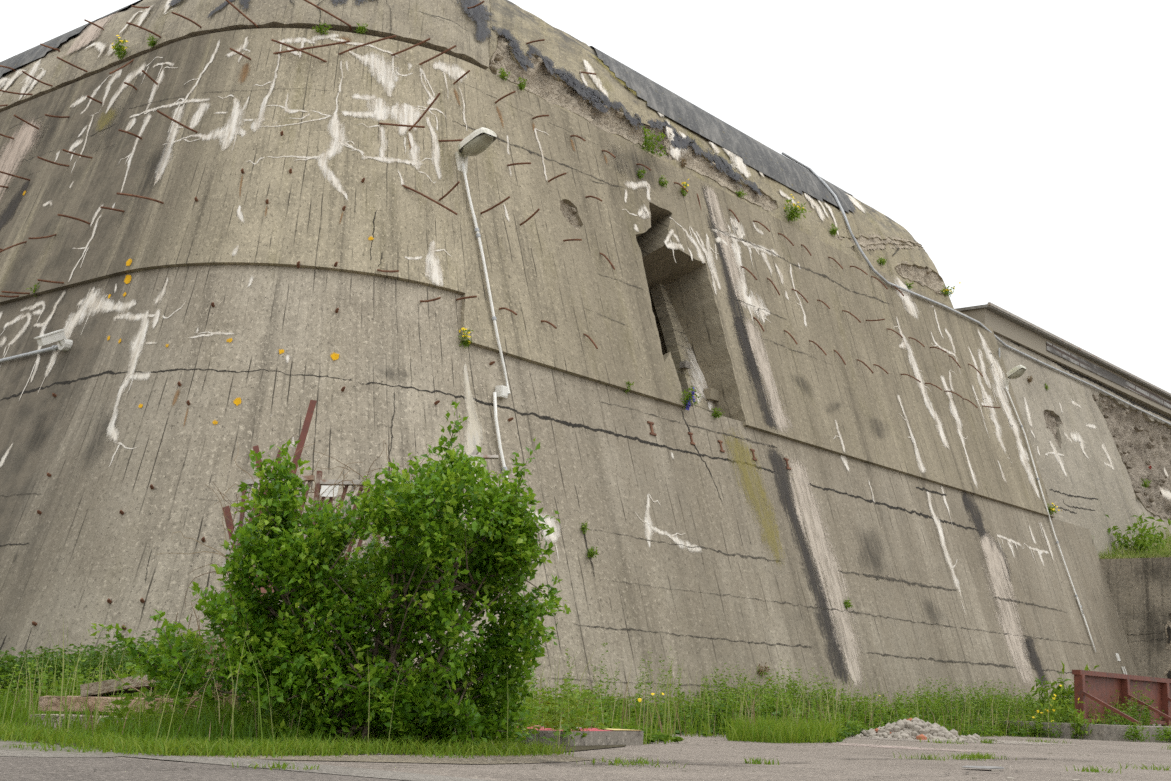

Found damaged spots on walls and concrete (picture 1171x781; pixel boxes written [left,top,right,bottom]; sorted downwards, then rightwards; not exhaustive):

water stain [65,0,181,57]
spalling [489,26,782,212]
water stain [0,34,467,465]
water stain [664,186,807,433]
spalling [835,233,946,297]
crack [0,368,978,531]
water stain [833,420,849,471]
water stain [894,278,1067,686]
water stain [1064,424,1096,459]
spalling [1092,394,1171,520]
water stain [768,449,863,686]